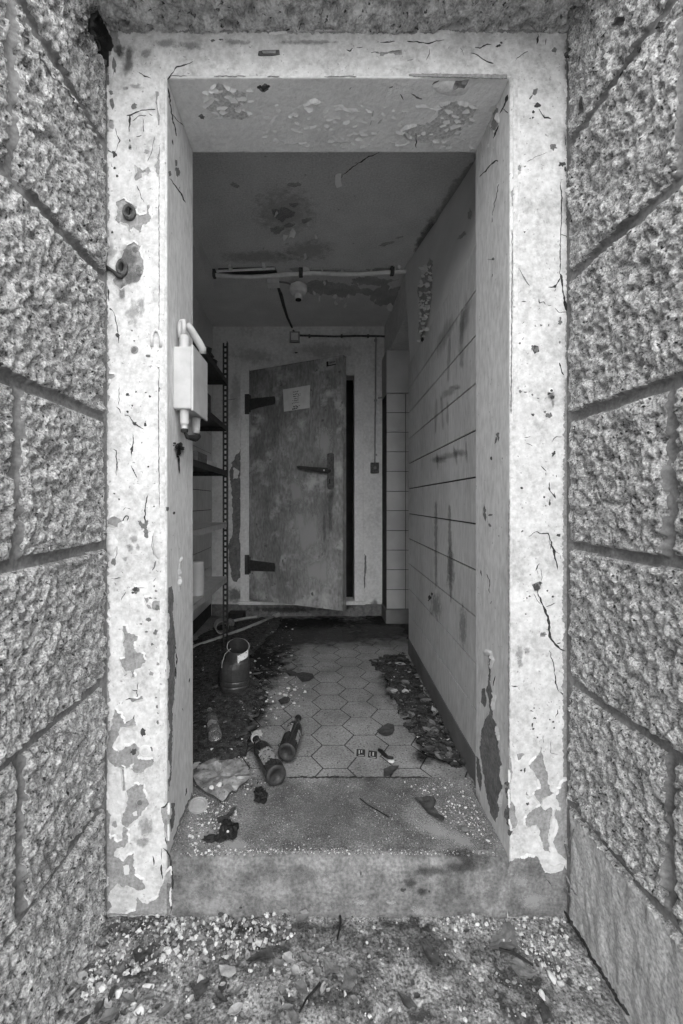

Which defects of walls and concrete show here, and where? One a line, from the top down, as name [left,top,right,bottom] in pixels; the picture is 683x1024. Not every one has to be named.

crack [127,61,193,329]
peeling [198,83,270,120]
peeling [395,101,500,151]
crack [479,95,567,412]
crack [114,378,160,521]
peeling [106,708,180,917]
peeling [106,557,183,841]
spalling [476,652,568,918]
crack [480,499,565,748]